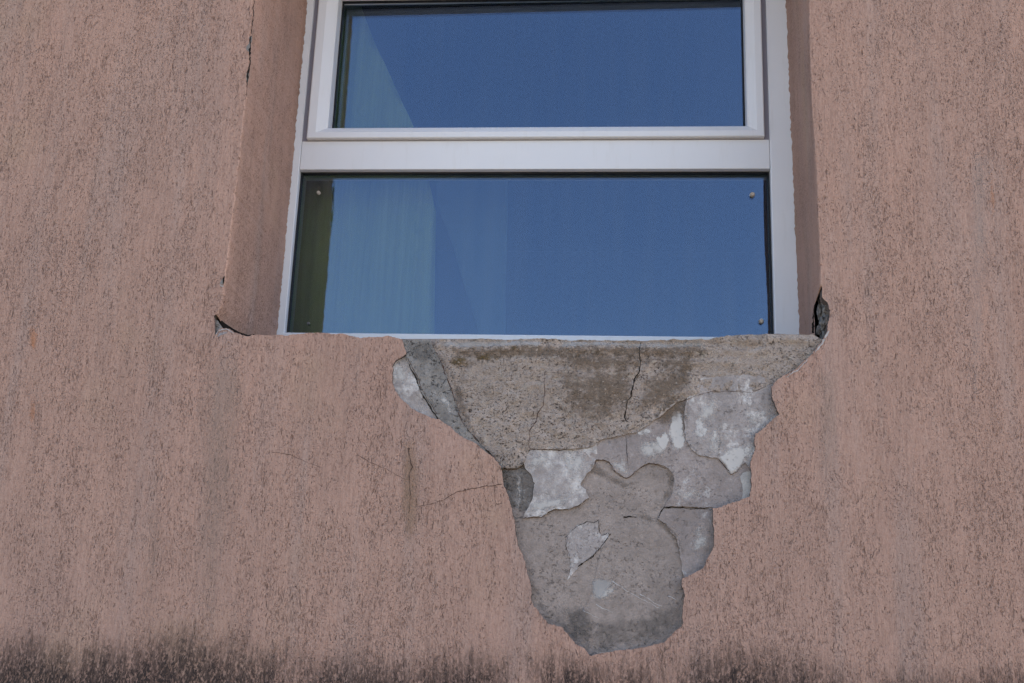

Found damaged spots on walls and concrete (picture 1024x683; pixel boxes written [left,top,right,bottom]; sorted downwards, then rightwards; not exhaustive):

crack [246,0,255,95]
crack [624,343,641,462]
crack [418,484,501,507]
spalling [393,291,829,656]
damp [0,635,284,683]
damp [308,655,494,683]
damp [541,662,603,683]
damp [690,656,817,683]